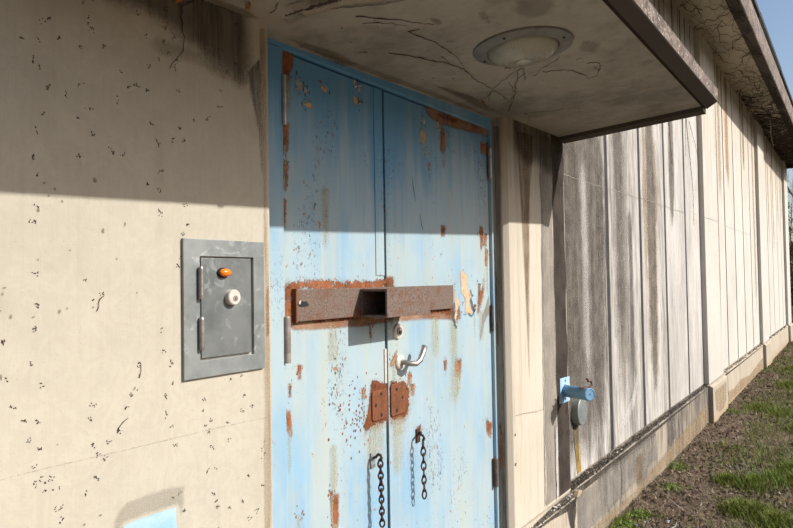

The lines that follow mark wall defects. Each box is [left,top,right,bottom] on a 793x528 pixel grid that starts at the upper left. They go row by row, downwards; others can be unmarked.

crack [285,0,403,17]
leakage [134,0,266,122]
rust [282,50,293,81]
rust [424,106,488,155]
rust [477,227,489,266]
rust [285,277,460,338]
peeling [452,269,476,328]
leakage [518,126,658,528]
rust [329,370,416,460]
leakage [668,418,676,446]
rust [327,490,340,528]